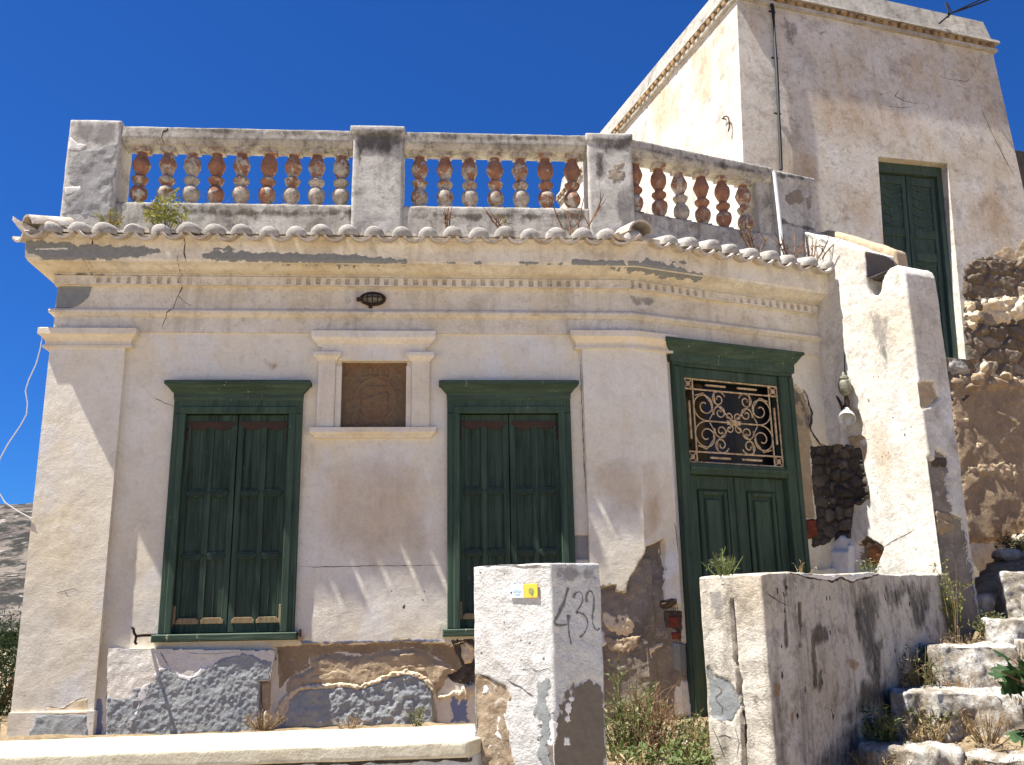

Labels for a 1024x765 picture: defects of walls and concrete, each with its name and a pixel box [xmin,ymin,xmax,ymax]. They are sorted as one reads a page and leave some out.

flaking render [533,539,691,765]